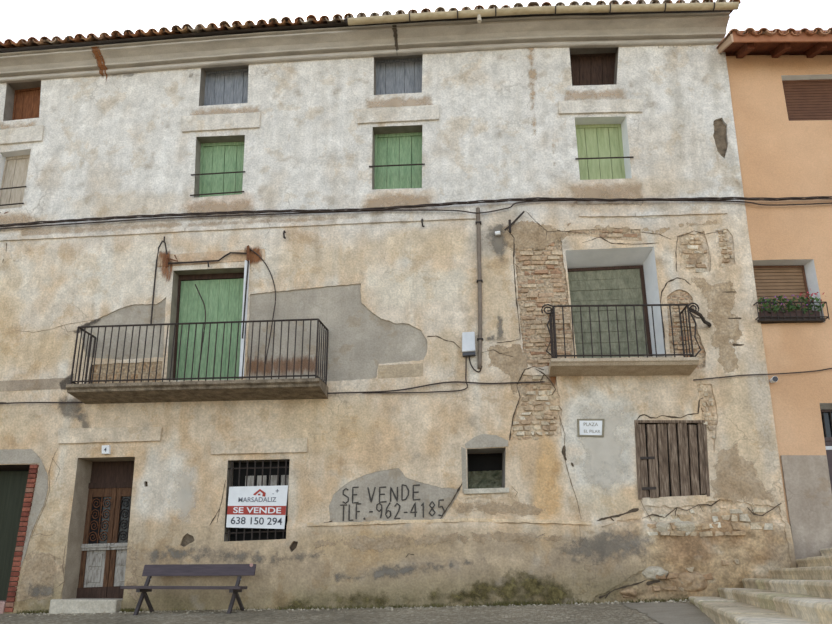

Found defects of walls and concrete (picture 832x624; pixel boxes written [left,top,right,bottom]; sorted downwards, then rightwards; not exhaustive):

corrosion [91,46,108,81]
corrosion [245,246,262,264]
flaking render [245,283,427,381]
crack [482,212,727,543]
flaking render [487,220,743,441]
flaking render [591,384,791,603]